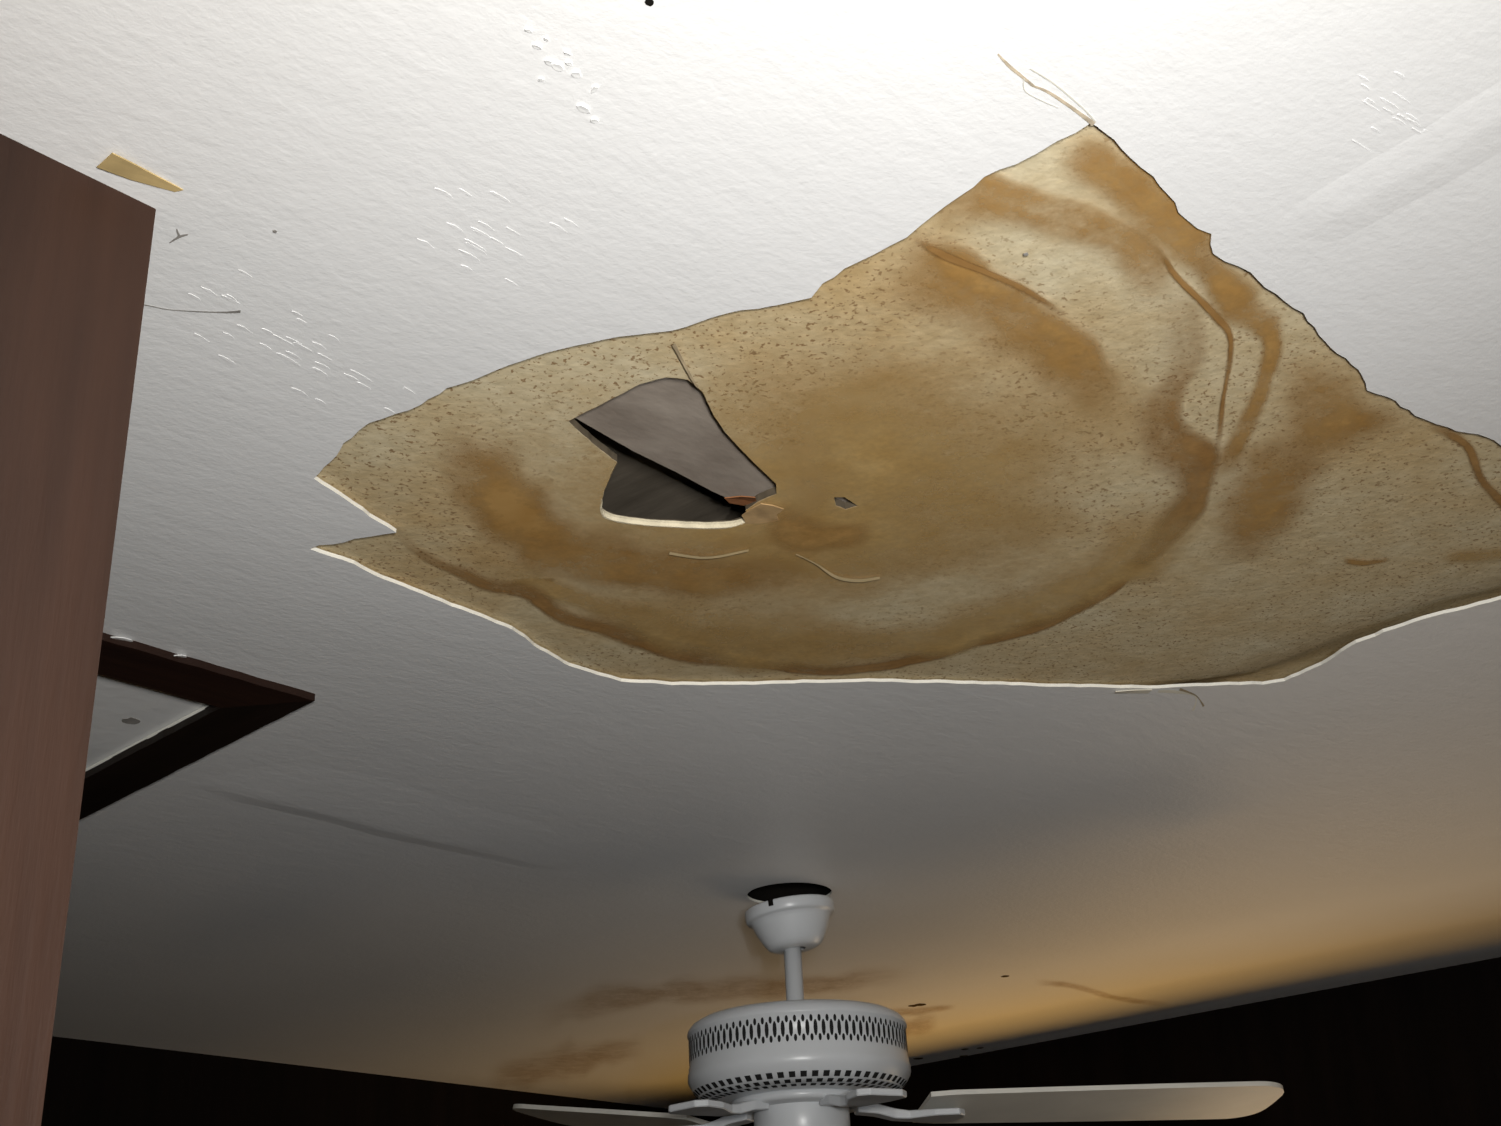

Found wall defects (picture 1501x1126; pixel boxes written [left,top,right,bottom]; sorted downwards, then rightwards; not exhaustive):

crack [997,54,1096,126]
peeling [97,152,183,192]
peeling [194,311,372,390]
water stain [436,147,1299,675]
peeling [316,124,1501,693]
water stain [1298,379,1383,447]
water stain [1445,431,1501,507]